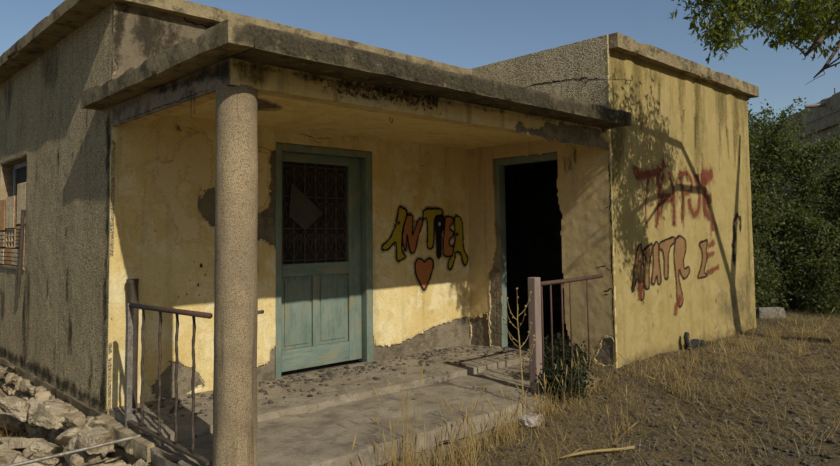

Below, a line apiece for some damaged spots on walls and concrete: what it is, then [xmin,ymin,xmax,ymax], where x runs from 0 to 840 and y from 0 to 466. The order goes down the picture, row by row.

water stain [113,10,179,70]
water stain [233,23,628,180]
crack [525,77,630,87]
spalling [513,117,609,150]
flaking render [197,185,215,227]
flaking render [257,150,276,249]
flaking render [373,222,503,360]
water stain [0,269,107,412]
flaking render [150,357,206,399]